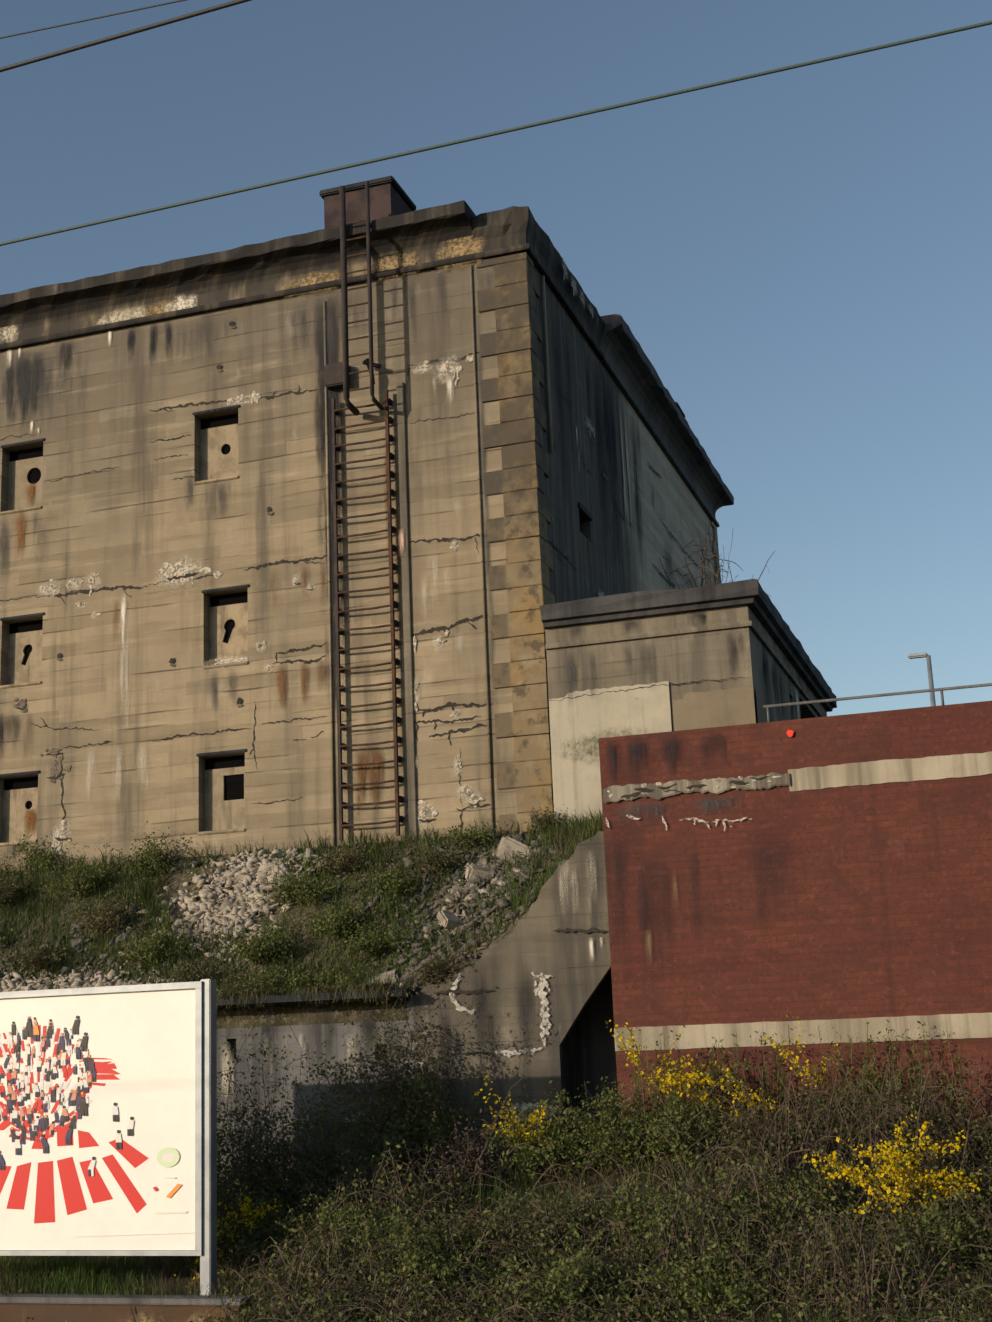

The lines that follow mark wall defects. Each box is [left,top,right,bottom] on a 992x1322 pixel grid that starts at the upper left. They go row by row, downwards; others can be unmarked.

water stain [6,327,50,431]
water stain [588,372,643,549]
corrosion [385,462,400,584]
spalling [39,572,101,616]
crack [0,575,214,604]
spalling [158,559,223,587]
crack [246,555,328,571]
crack [414,702,493,832]
spalling [603,772,790,804]